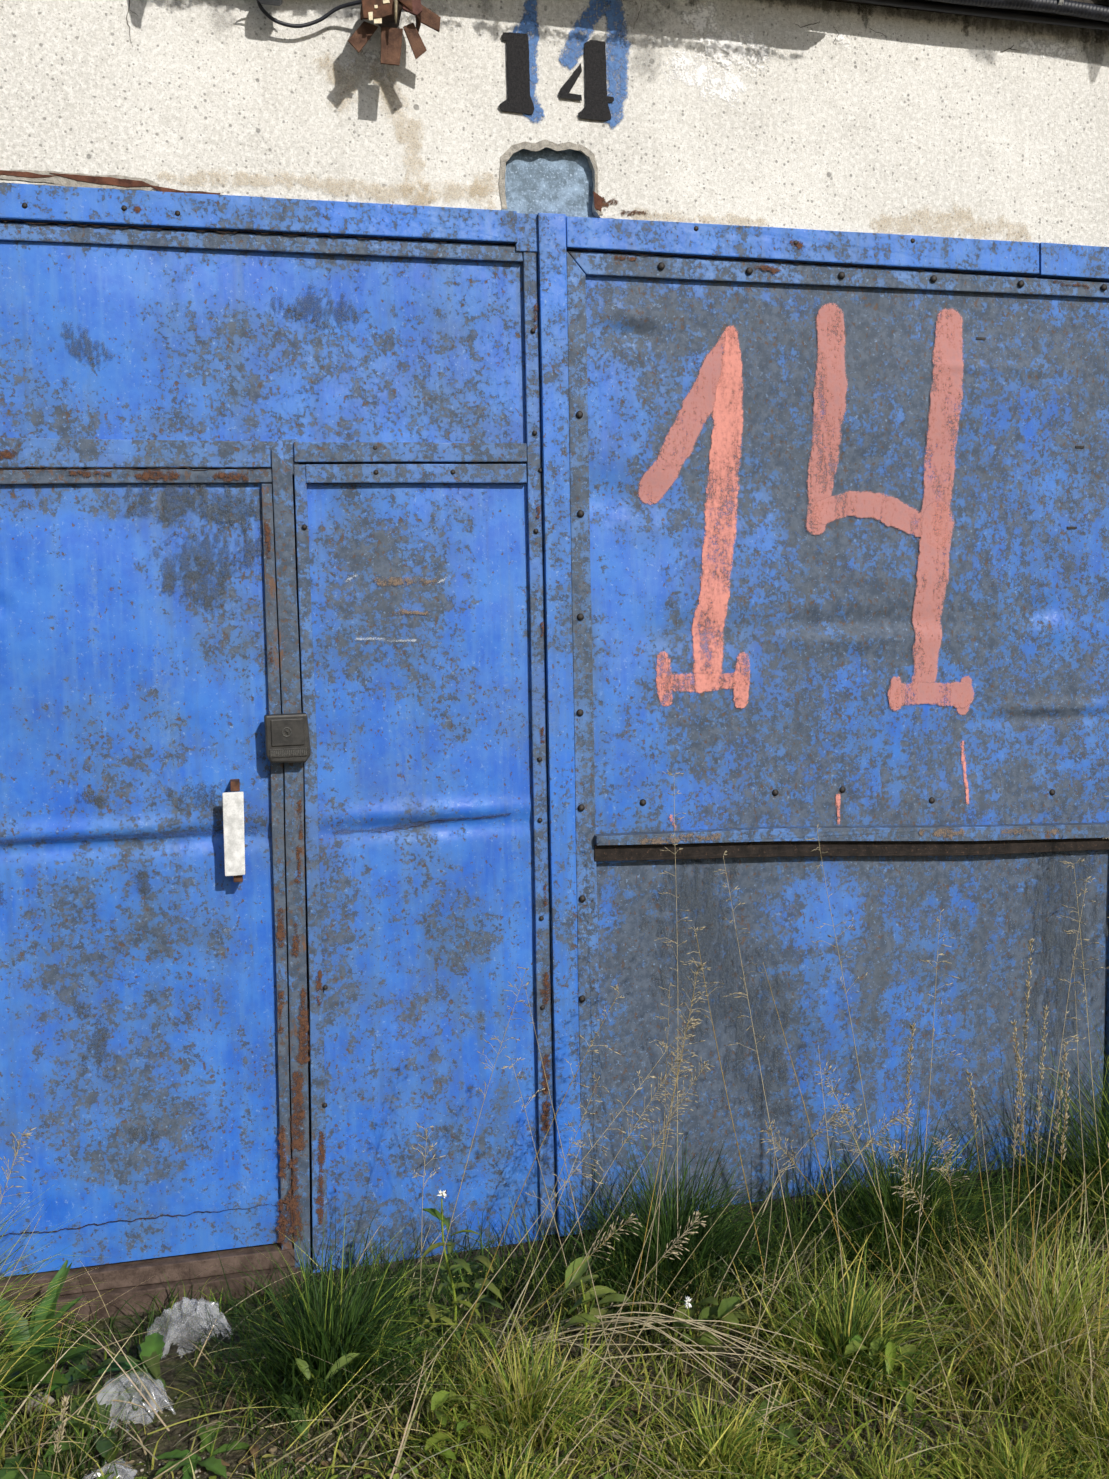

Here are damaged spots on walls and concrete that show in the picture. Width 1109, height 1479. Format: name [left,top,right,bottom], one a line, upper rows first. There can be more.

corrosion [295,800,303,883]
corrosion [639,833,721,844]
corrosion [919,827,965,839]
corrosion [276,905,300,958]
corrosion [276,970,325,1245]